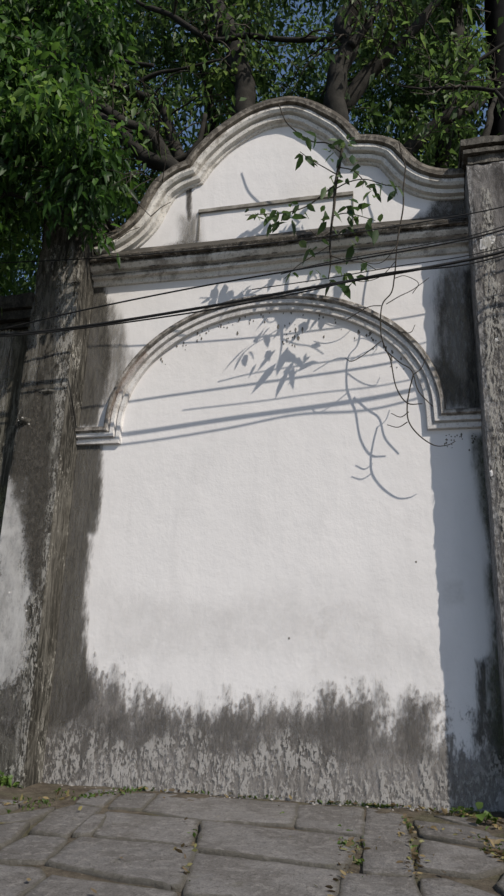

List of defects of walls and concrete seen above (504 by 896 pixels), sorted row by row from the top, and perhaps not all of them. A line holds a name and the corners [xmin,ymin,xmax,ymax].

damp [10,251,76,648]
damp [80,287,126,426]
damp [42,433,504,813]
damp [382,198,466,229]
damp [434,267,480,408]
peeling [479,187,504,543]